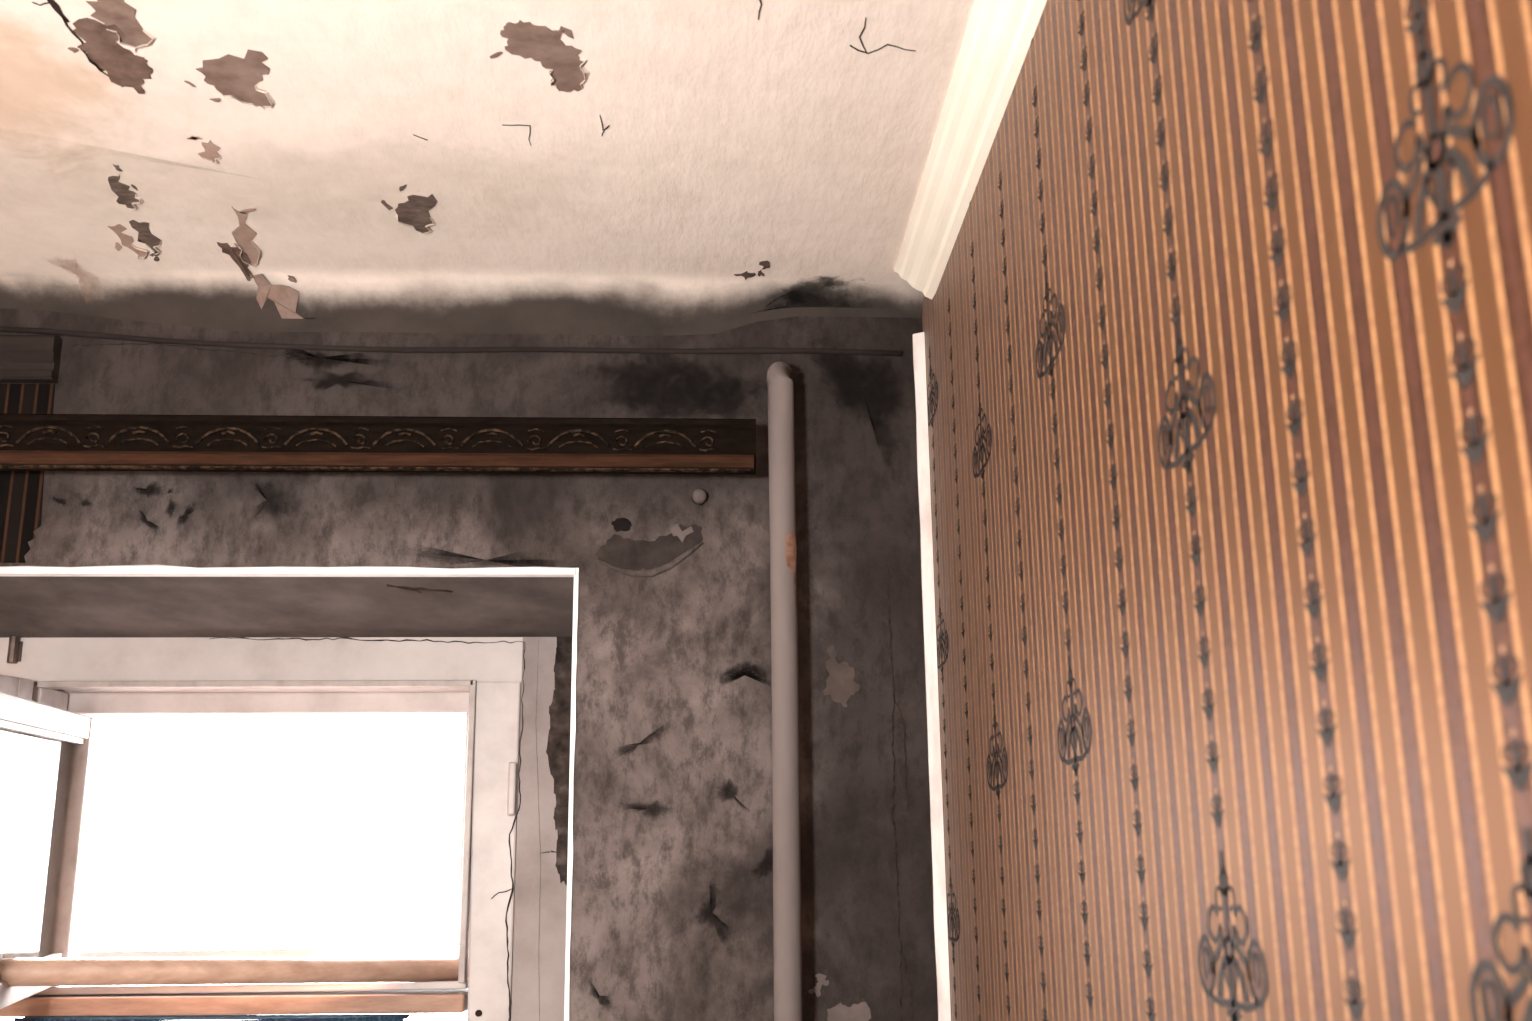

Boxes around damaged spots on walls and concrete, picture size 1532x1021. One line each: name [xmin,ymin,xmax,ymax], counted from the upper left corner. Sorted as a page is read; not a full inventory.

crack [32,0,124,87]
peeling [67,0,157,94]
peeling [184,49,276,109]
peeling [490,20,590,92]
peeling [108,164,162,262]
peeling [381,185,437,234]
peeling [217,207,315,319]
water stain [769,277,853,310]
water stain [287,350,378,389]
water stain [607,358,752,417]
water stain [820,354,899,445]
spalling [596,518,703,570]